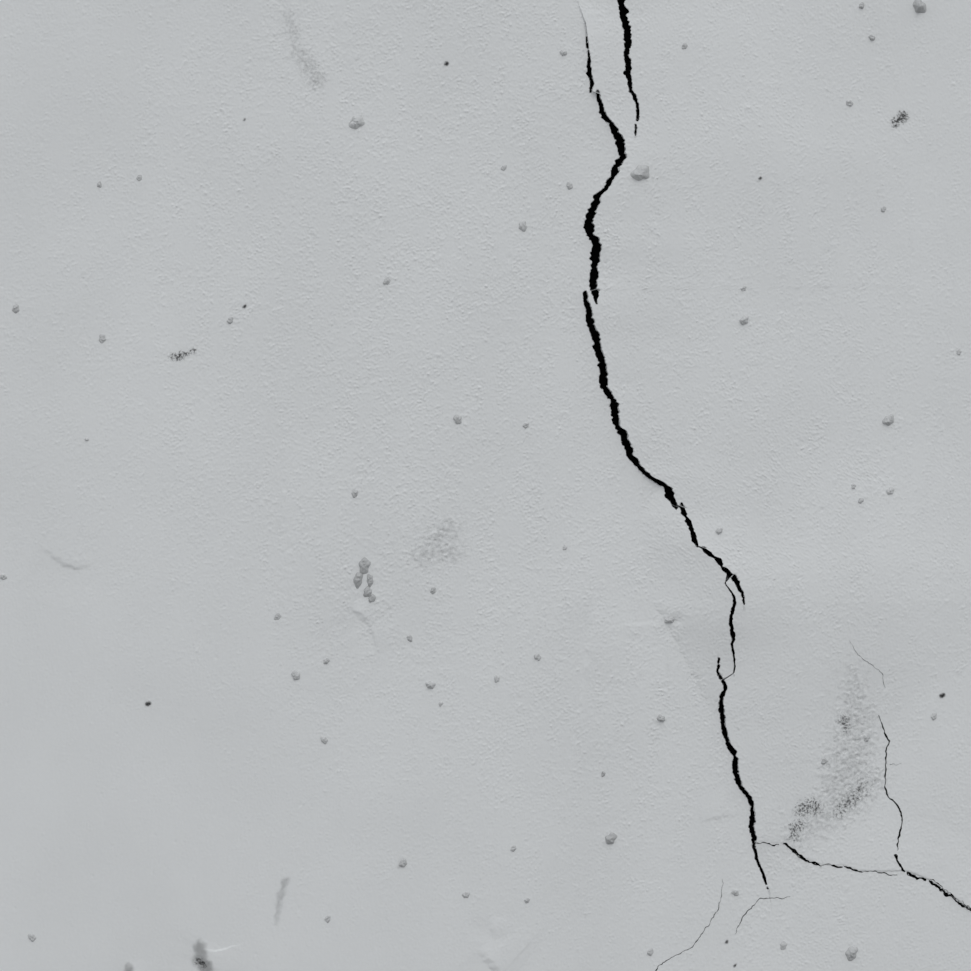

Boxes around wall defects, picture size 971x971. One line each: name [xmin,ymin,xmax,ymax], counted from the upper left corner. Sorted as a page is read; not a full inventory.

crack [655,890,722,971]
crack [583,0,971,932]